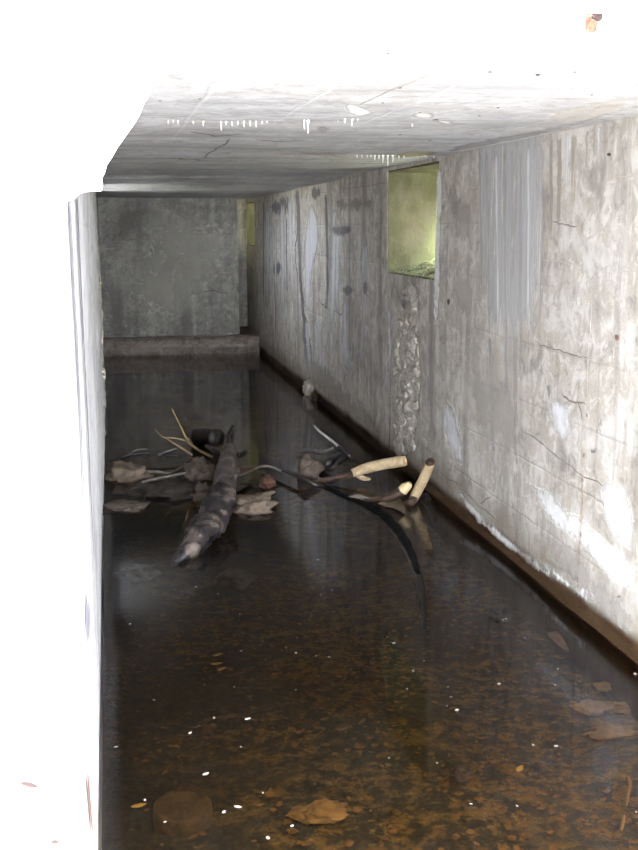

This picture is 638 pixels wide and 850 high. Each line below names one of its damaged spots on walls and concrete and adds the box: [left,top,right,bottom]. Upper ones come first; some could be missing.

crack [160,71,439,161]
damp [263,197,293,330]
damp [260,350,304,391]
damp [305,187,352,375]
damp [313,390,397,459]
spalling [392,283,421,456]
damp [451,129,575,448]
crack [521,300,607,593]
damp [394,466,638,672]